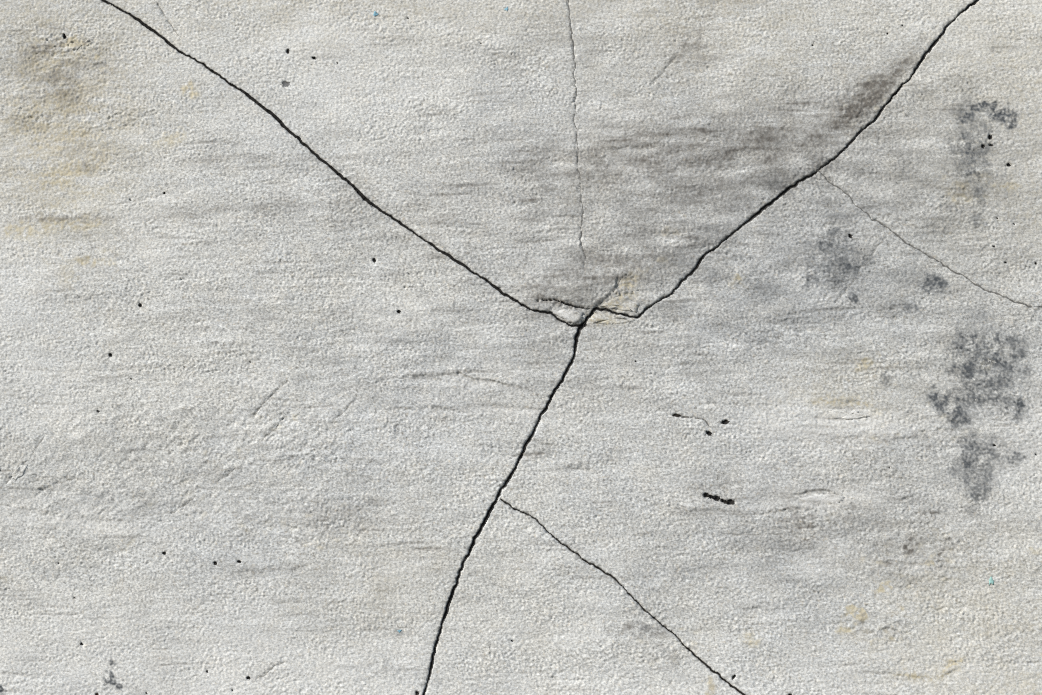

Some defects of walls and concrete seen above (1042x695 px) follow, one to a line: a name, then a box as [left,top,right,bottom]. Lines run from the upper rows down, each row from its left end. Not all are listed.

crack [102,0,979,328]
crack [818,171,1042,308]
crack [423,325,582,695]
crack [501,499,745,695]
leakage [923,308,1039,517]